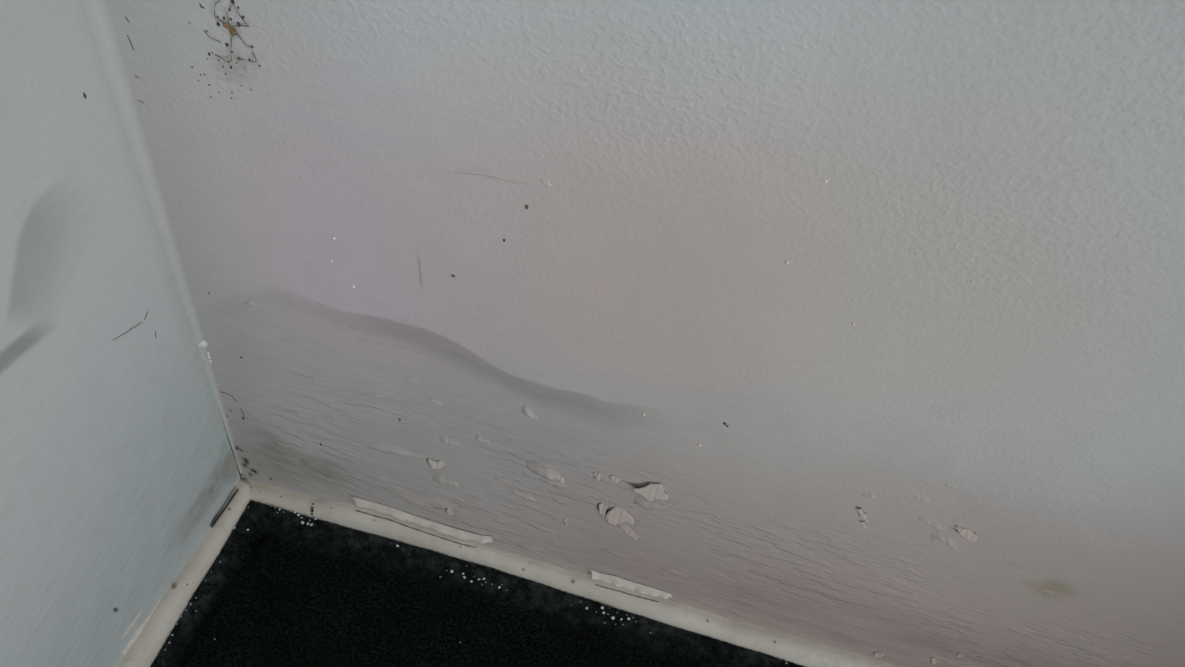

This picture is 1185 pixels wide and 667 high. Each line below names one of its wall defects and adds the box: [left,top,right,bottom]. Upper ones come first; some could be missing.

peeling [593,472,669,502]
peeling [350,496,493,544]
peeling [599,503,640,541]